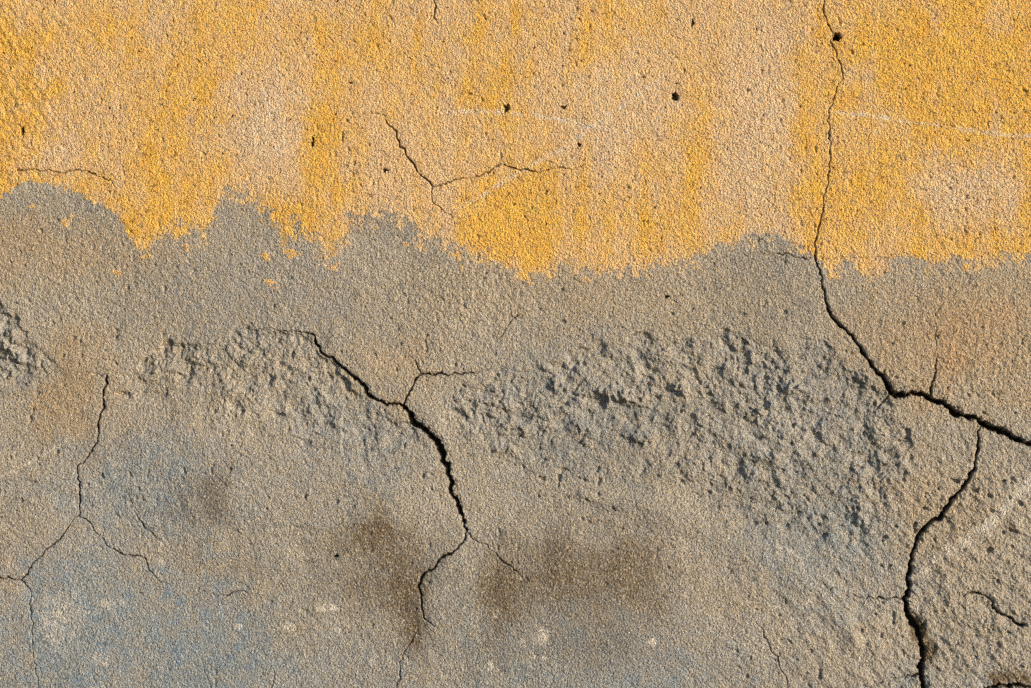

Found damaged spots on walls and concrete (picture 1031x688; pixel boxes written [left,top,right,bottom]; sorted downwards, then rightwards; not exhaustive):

peeling [0,174,144,259]
crack [359,107,611,232]
spalling [0,307,52,395]
crack [0,369,179,688]
spalling [110,333,431,479]
crack [231,299,552,688]
damp [306,496,702,679]
spalling [443,331,913,579]
crack [731,0,1031,688]